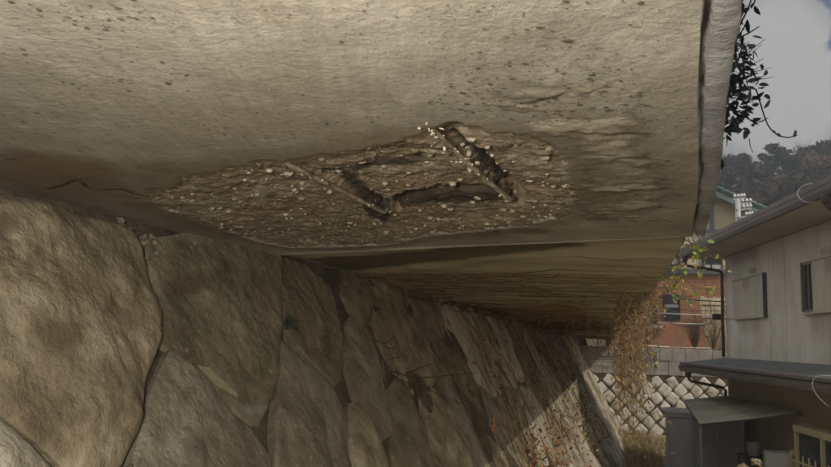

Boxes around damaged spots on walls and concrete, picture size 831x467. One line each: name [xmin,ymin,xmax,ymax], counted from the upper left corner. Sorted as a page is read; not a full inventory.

crack [44,178,151,197]
spalling [140,121,578,248]